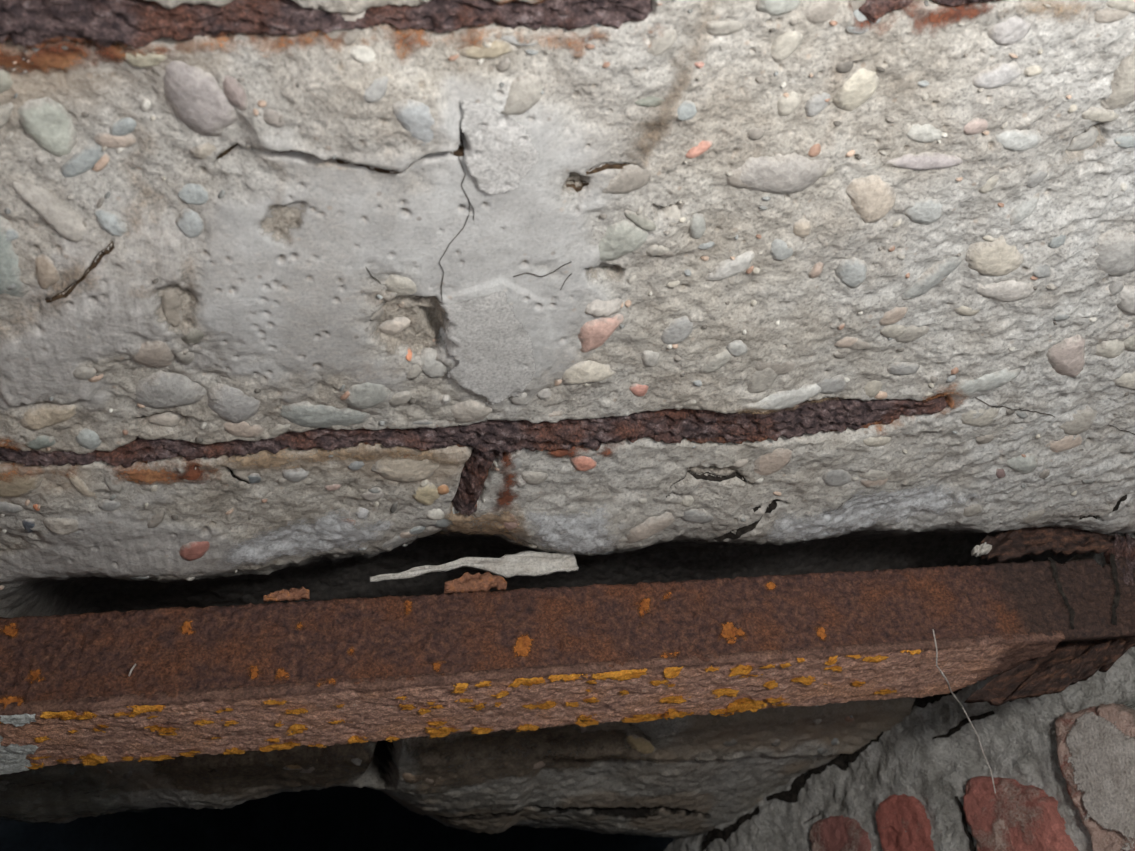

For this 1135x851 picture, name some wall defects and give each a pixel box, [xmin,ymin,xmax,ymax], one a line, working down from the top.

corrosion [901,1,990,32]
crack [216,143,422,174]
crack [439,129,474,301]
crack [44,241,114,303]
peeling [374,292,536,405]
corrosion [448,451,521,543]
spalling [686,466,737,475]
peeling [370,551,579,582]
corrosion [444,571,507,594]
corrosion [979,526,1135,585]
corrosion [964,637,1135,706]
crack [437,732,883,851]